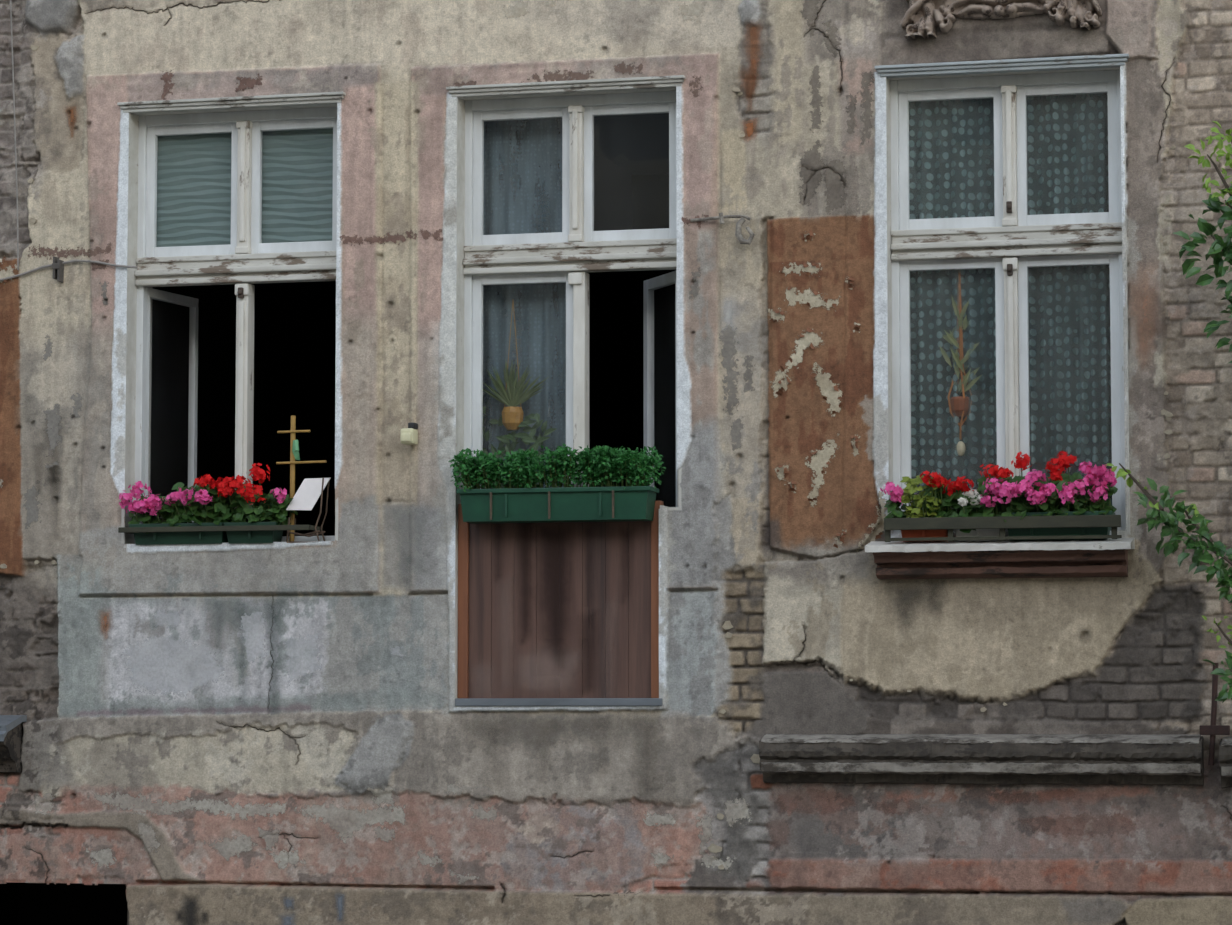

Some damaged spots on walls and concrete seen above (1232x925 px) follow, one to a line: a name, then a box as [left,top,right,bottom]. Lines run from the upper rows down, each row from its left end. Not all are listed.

crack [88,0,280,26]
crack [804,0,843,96]
flaking render [0,0,112,305]
peeling [799,66,847,212]
peeling [767,261,855,323]
peeling [719,325,755,451]
peeling [769,327,843,417]
flaking render [820,0,1232,743]
peeling [775,434,861,507]
crack [218,599,303,765]
peeling [0,560,1232,890]
crack [0,823,68,882]